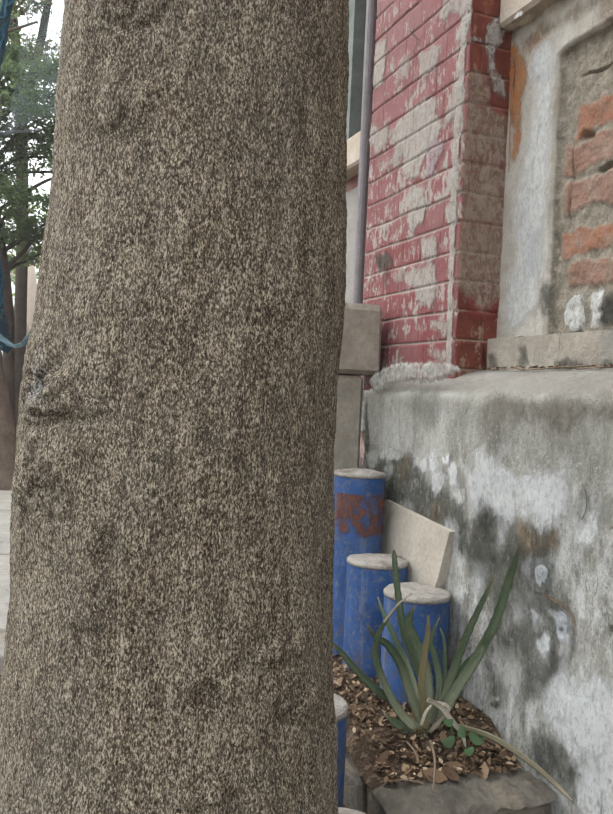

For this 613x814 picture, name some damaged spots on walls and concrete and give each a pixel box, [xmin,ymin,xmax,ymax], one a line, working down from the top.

peeling [440,0,481,44]
peeling [369,39,551,327]
peeling [590,290,604,327]
spalling [369,350,460,392]
damp [554,358,583,369]
damp [491,395,613,432]
damp [359,385,566,695]
damp [529,732,575,799]